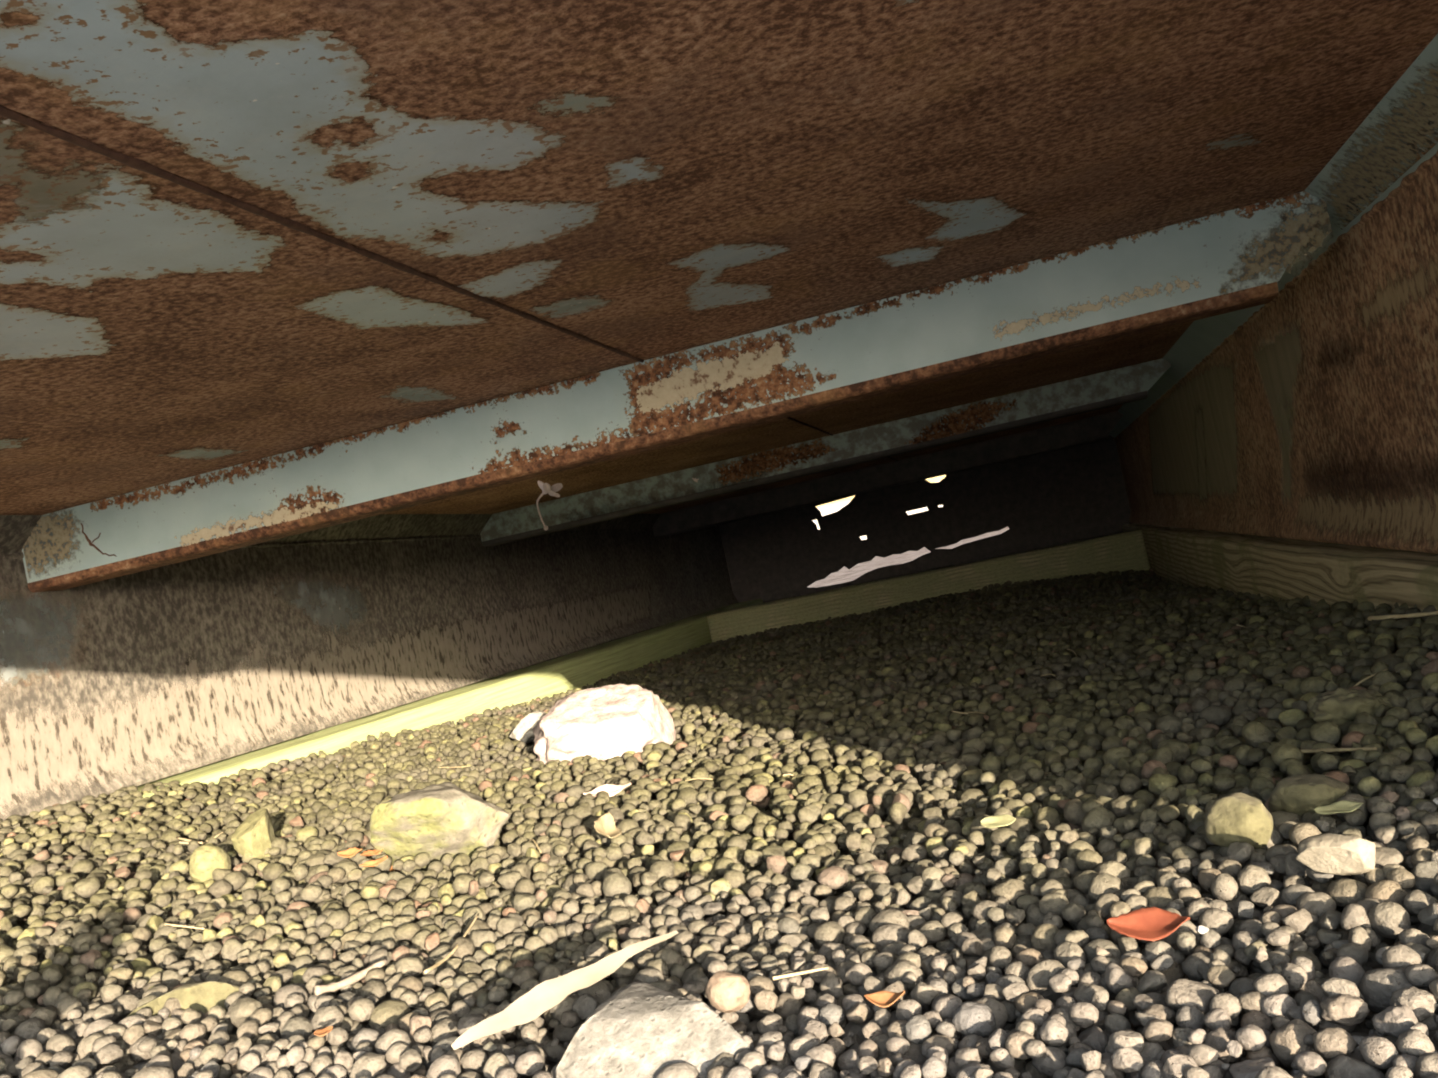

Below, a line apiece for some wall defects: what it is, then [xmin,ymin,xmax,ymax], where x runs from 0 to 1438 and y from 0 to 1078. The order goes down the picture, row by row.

peeling [0,0,664,299]
peeling [873,196,1027,269]
peeling [0,303,116,361]
peeling [294,285,488,329]
peeling [528,294,615,319]
peeling [667,243,795,312]
peeling [378,386,464,403]
corrosion [23,191,1346,577]
peeling [636,341,791,415]
peeling [155,447,249,460]
peeling [174,501,343,547]